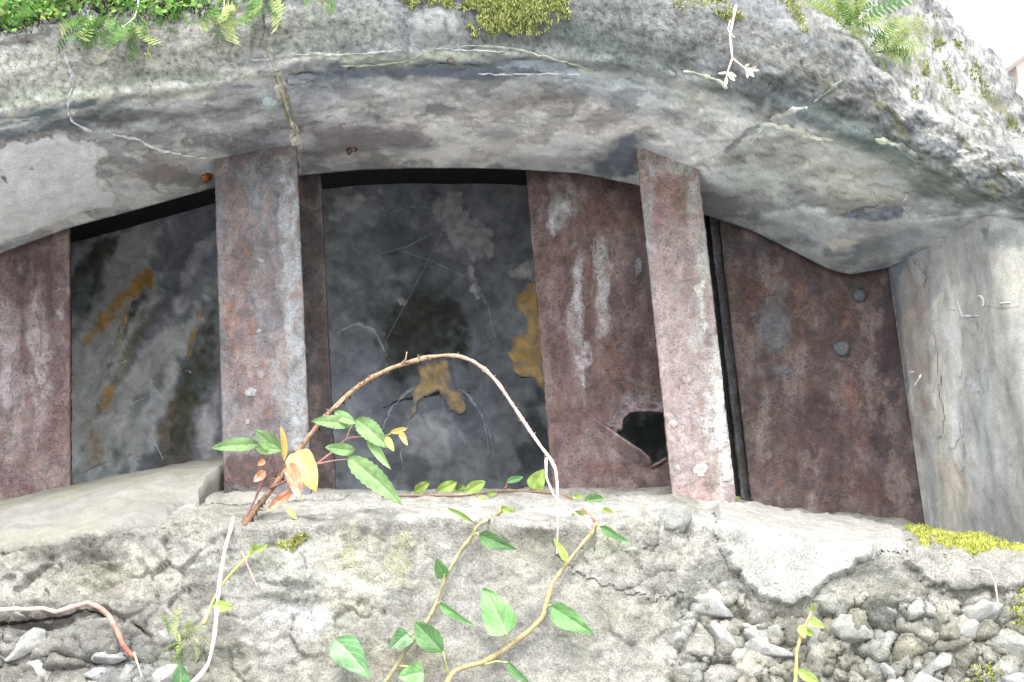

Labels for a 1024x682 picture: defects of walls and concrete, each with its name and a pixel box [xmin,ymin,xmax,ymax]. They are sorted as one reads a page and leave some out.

crack [62,44,207,159]
crack [250,0,402,173]
rust [582,190,603,294]
rust [645,175,688,234]
rust [898,259,944,453]
rust [226,451,277,491]